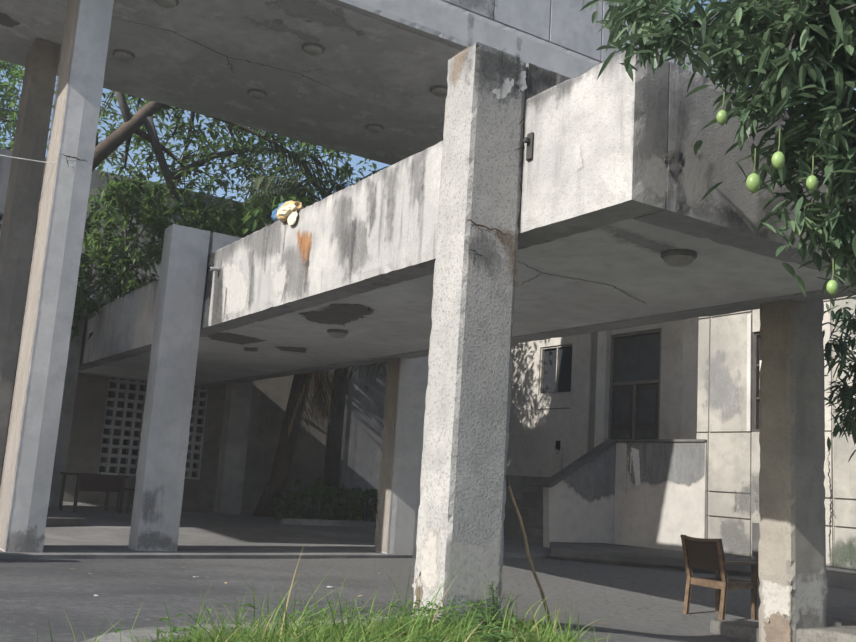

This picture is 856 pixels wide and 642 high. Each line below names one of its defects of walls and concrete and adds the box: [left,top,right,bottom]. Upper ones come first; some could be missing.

peeling [0,12,21,27]
spalling [492,71,527,99]
damp [474,39,559,97]
crack [466,93,645,303]
damp [205,243,235,325]
damp [245,221,306,305]
rust [297,231,311,261]
peeling [299,303,378,327]
damp [564,444,616,502]
damp [625,438,705,486]
damp [831,540,856,566]